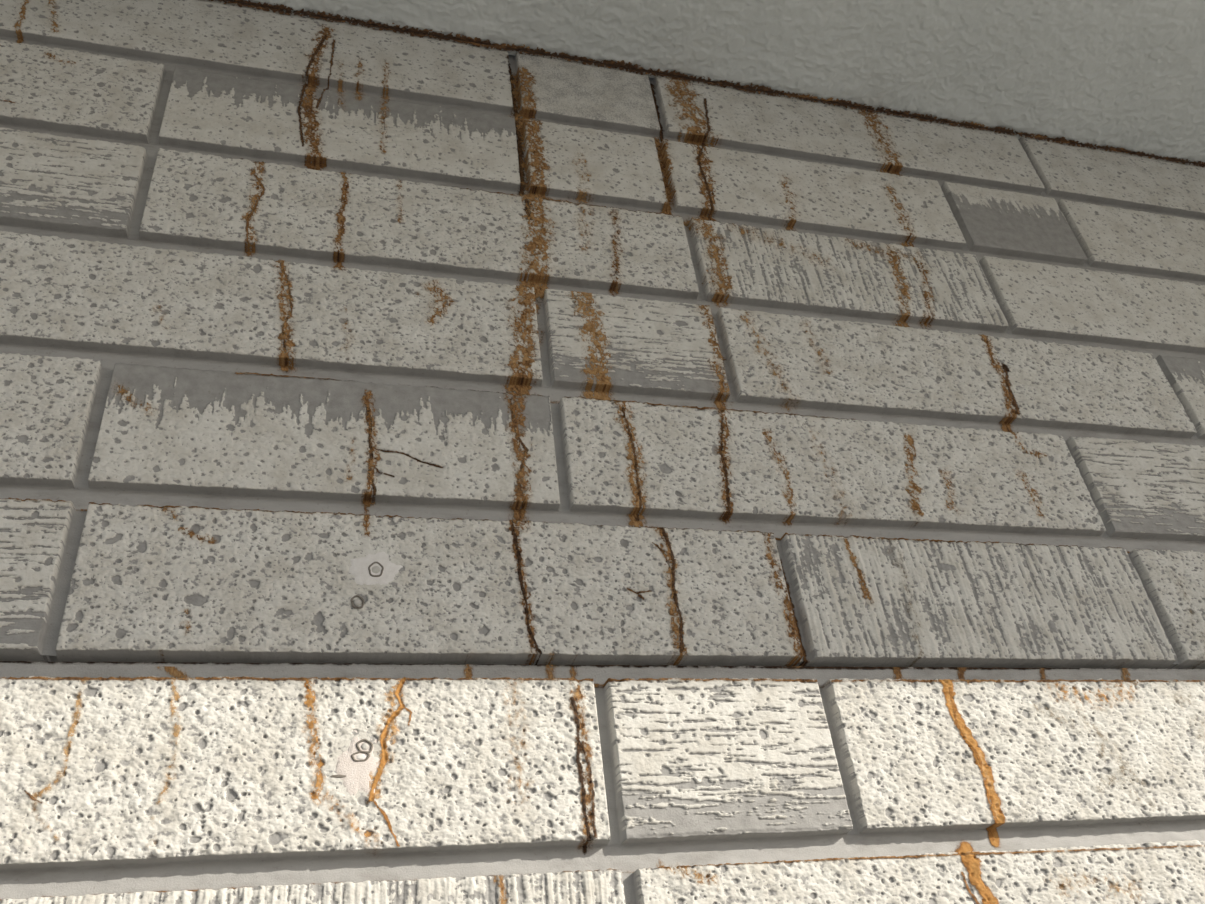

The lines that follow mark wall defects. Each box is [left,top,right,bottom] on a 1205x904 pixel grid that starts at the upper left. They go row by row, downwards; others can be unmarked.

crack [209,0,1205,168]
corrosion [848,110,935,328]
corrosion [2,24,865,853]
corrosion [978,334,1047,459]
corrosion [658,429,1205,904]
corrosion [494,875,508,904]